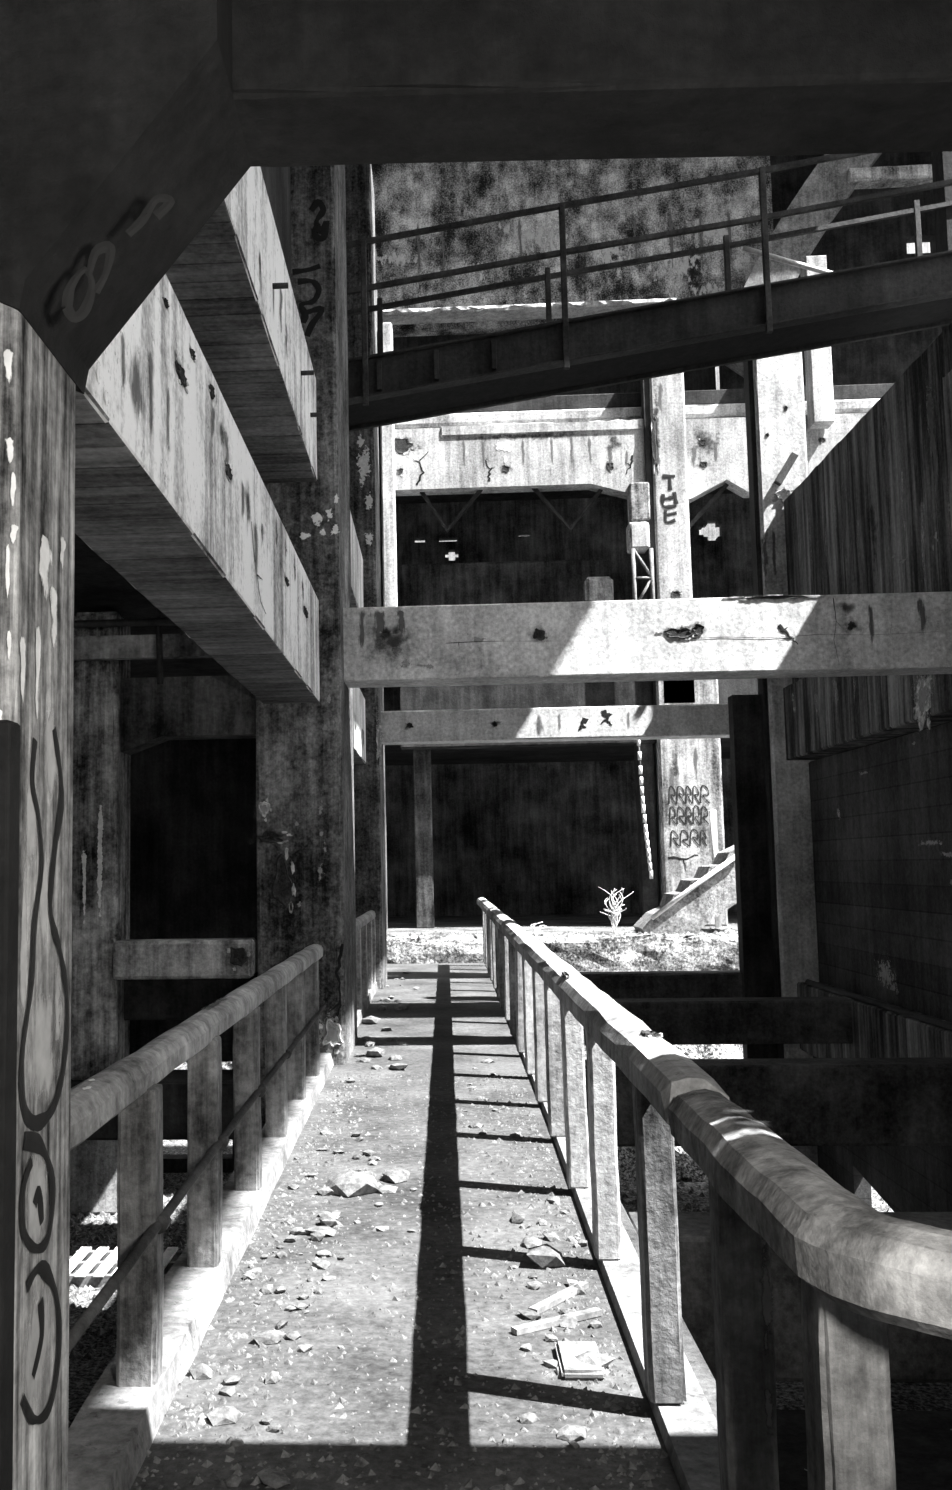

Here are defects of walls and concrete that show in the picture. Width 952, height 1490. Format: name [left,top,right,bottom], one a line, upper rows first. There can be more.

peeling [3,349,13,382]
water stain [122,333,170,450]
peeling [6,437,16,506]
water stain [212,408,229,463]
peeling [5,524,19,597]
water stain [242,482,304,598]
peeling [7,535,66,719]
spalling [656,622,705,640]